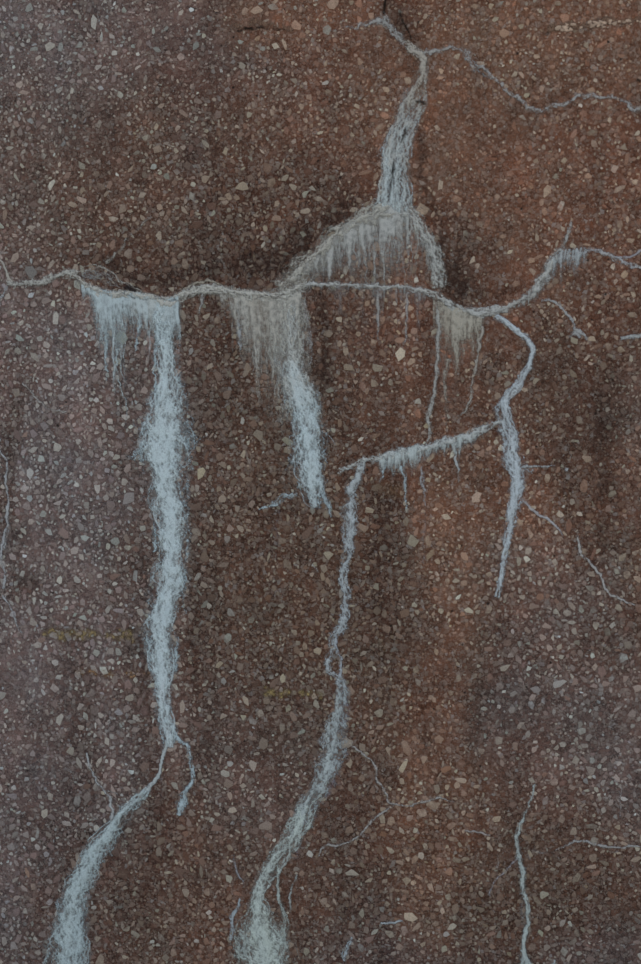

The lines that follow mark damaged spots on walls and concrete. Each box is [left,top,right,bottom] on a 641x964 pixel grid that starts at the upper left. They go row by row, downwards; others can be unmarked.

crack [355,0,640,112]
crack [0,221,641,340]
crack [22,383,66,413]
crack [0,439,22,633]
water stain [45,283,197,964]
water stain [220,41,561,964]
crack [577,538,634,605]
crack [318,746,448,856]
crack [556,840,641,850]